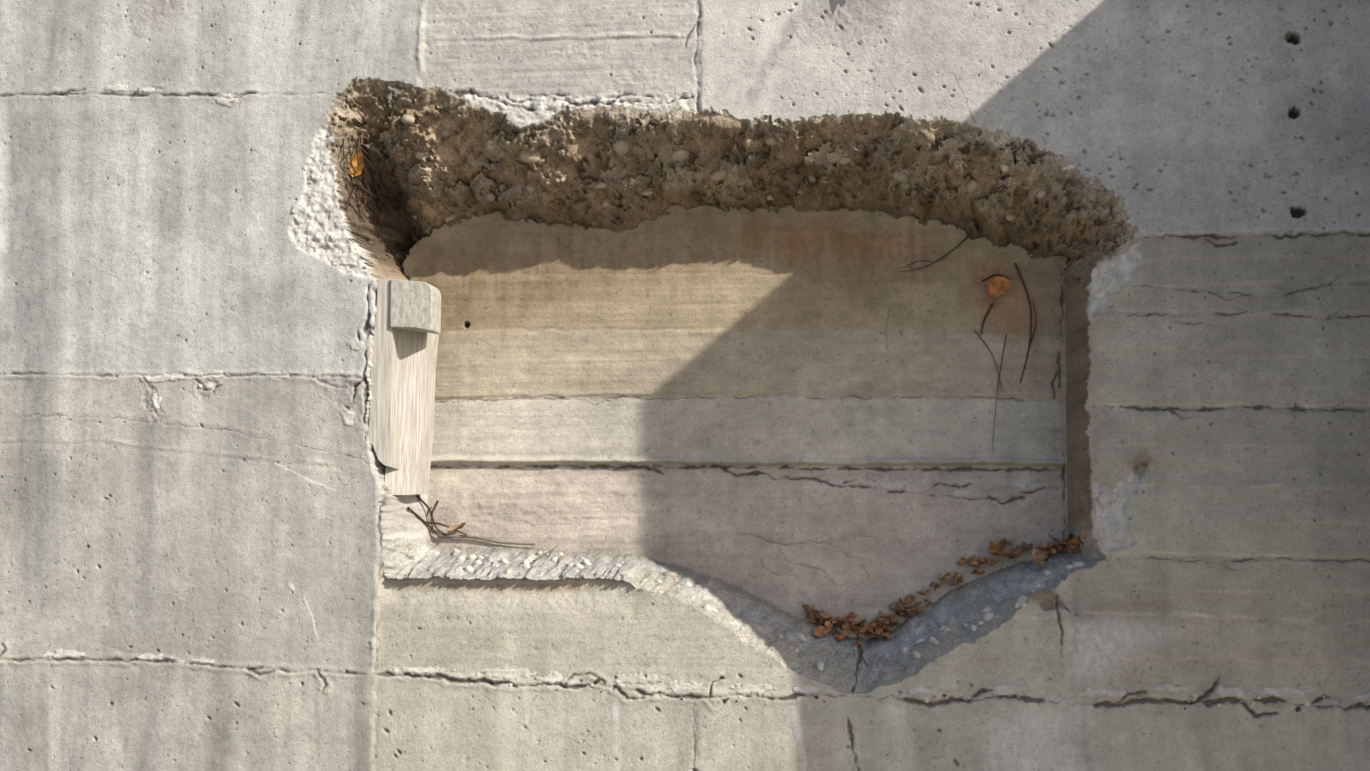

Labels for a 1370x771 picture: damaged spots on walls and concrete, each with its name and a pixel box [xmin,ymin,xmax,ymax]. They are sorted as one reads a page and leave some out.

crack [448,0,702,117]
spalling [286,77,1145,318]
crack [1136,229,1370,249]
corrosion [956,250,1060,386]
spalling [308,368,368,430]
crack [0,264,1370,771]
spalling [382,445,1184,694]